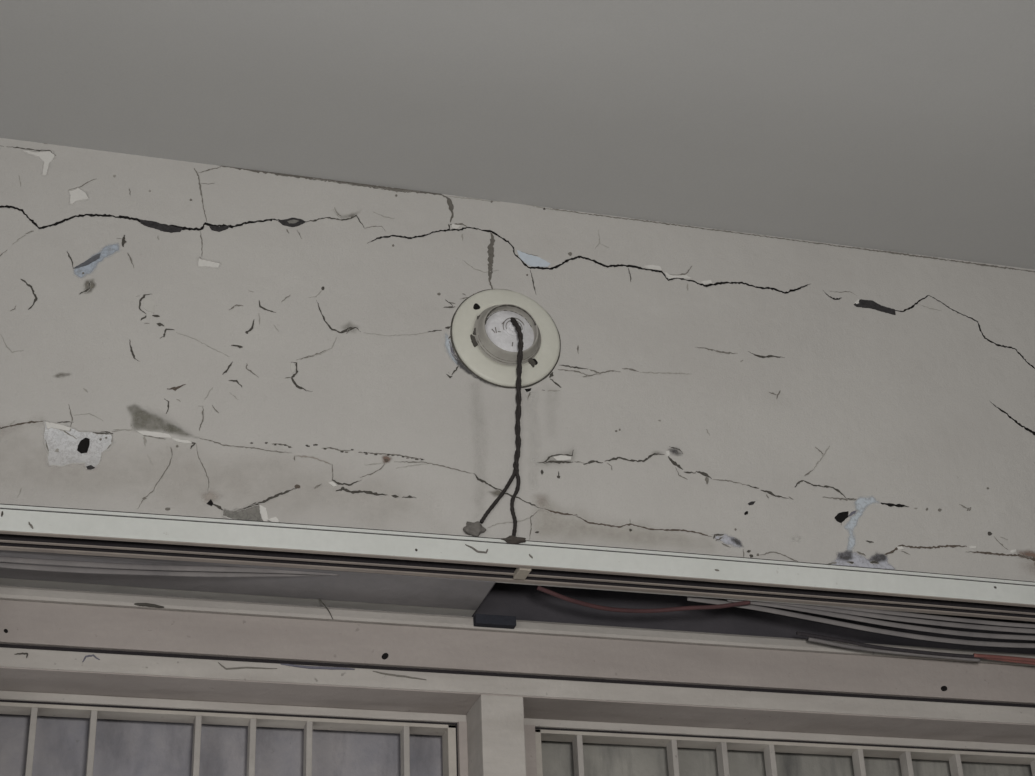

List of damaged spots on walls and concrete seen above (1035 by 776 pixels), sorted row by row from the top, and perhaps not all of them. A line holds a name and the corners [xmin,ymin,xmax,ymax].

peeling [0,145,57,176]
peeling [66,235,127,294]
crack [0,166,1035,369]
crack [0,420,43,430]
flaking render [43,404,125,470]
crack [129,286,712,540]
crack [990,401,1035,436]
crack [537,445,971,512]
flaking render [828,497,894,570]
crack [884,532,1035,562]